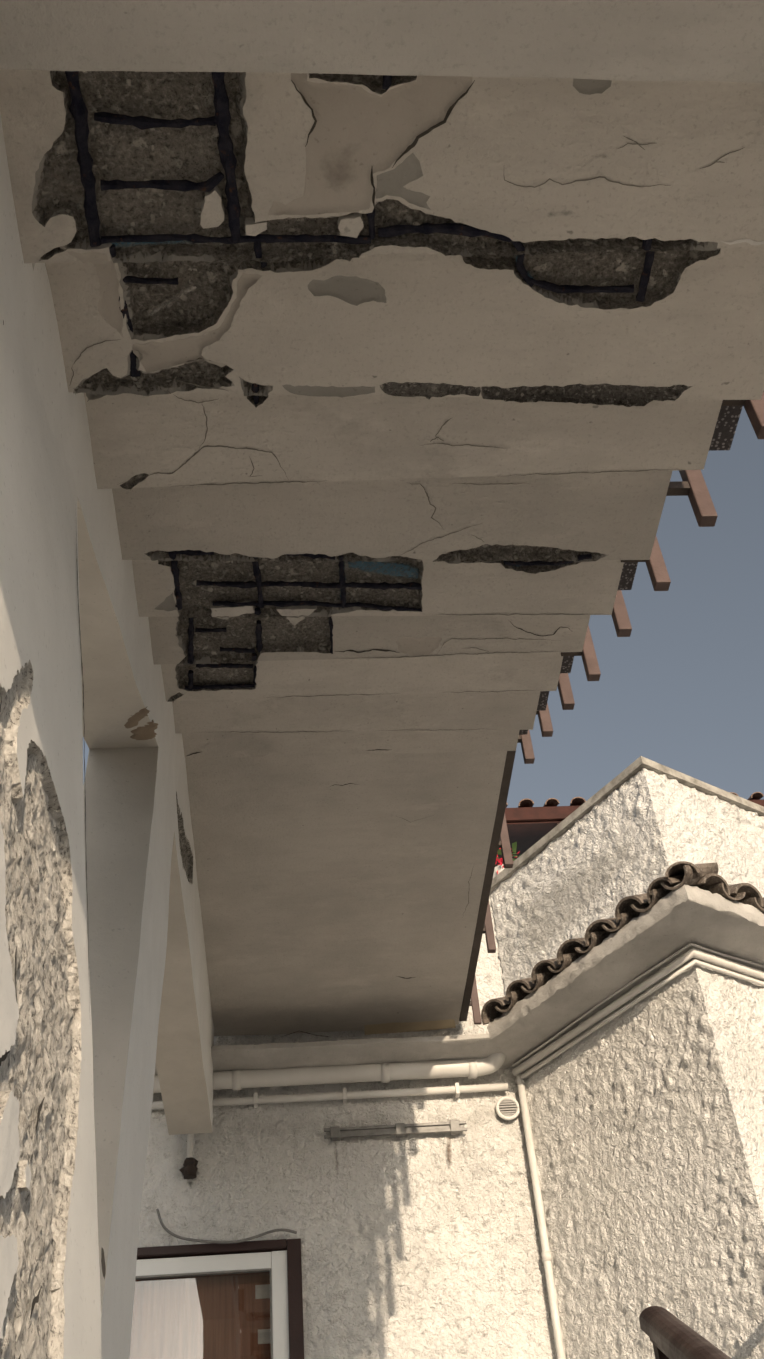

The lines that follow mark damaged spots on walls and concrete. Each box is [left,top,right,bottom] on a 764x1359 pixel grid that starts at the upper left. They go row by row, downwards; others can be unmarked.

crack [504,136,670,188]
crack [700,147,745,169]
spalling [32,71,764,407]
crack [122,381,287,483]
crack [425,419,498,448]
crack [396,483,529,558]
spalling [144,544,608,703]
peeling [124,706,158,740]
flaking render [0,659,82,1359]